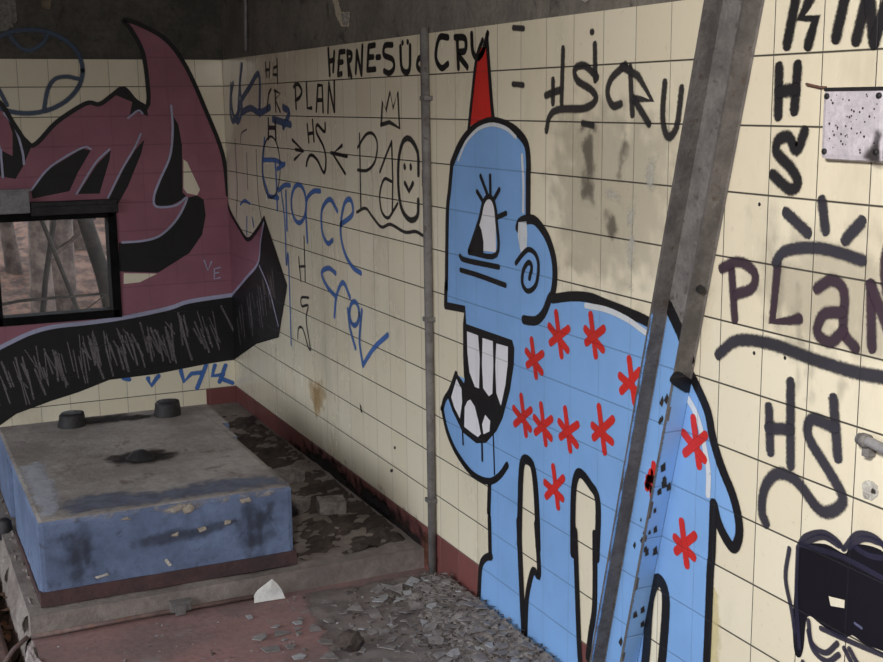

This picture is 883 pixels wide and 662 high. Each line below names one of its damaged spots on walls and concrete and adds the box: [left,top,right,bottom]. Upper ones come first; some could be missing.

peeling [0,0,17,31]
spalling [23,462,57,516]
spalling [0,530,41,662]